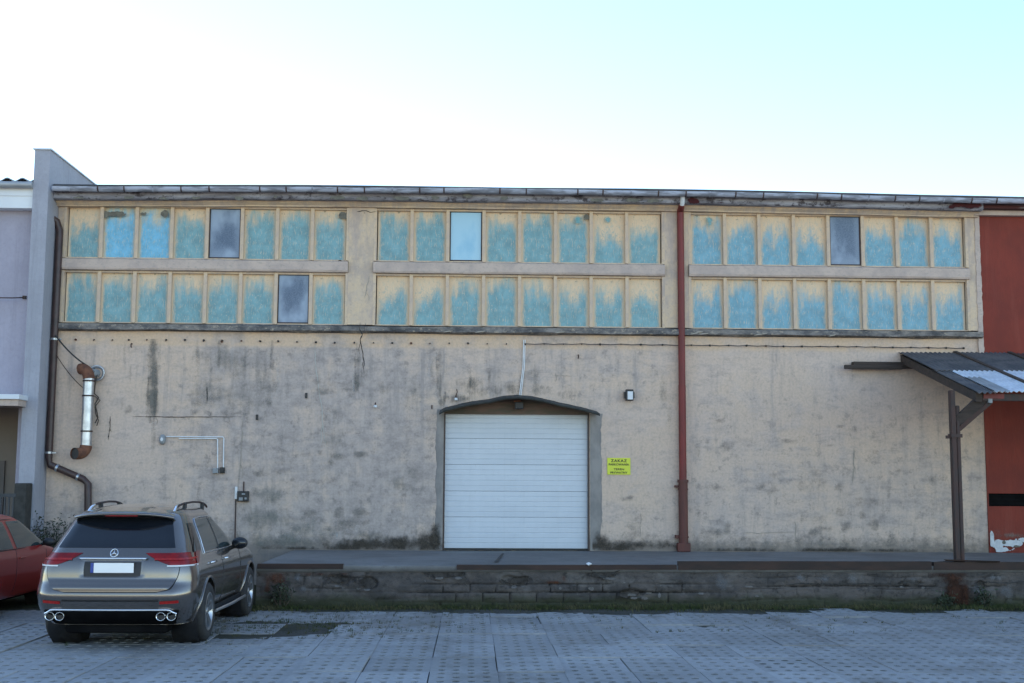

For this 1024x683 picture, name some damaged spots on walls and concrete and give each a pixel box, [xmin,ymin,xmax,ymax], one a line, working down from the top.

crack [359,323,407,370]
damp [147,341,157,414]
damp [327,521,440,550]
peeling [990,531,1024,552]